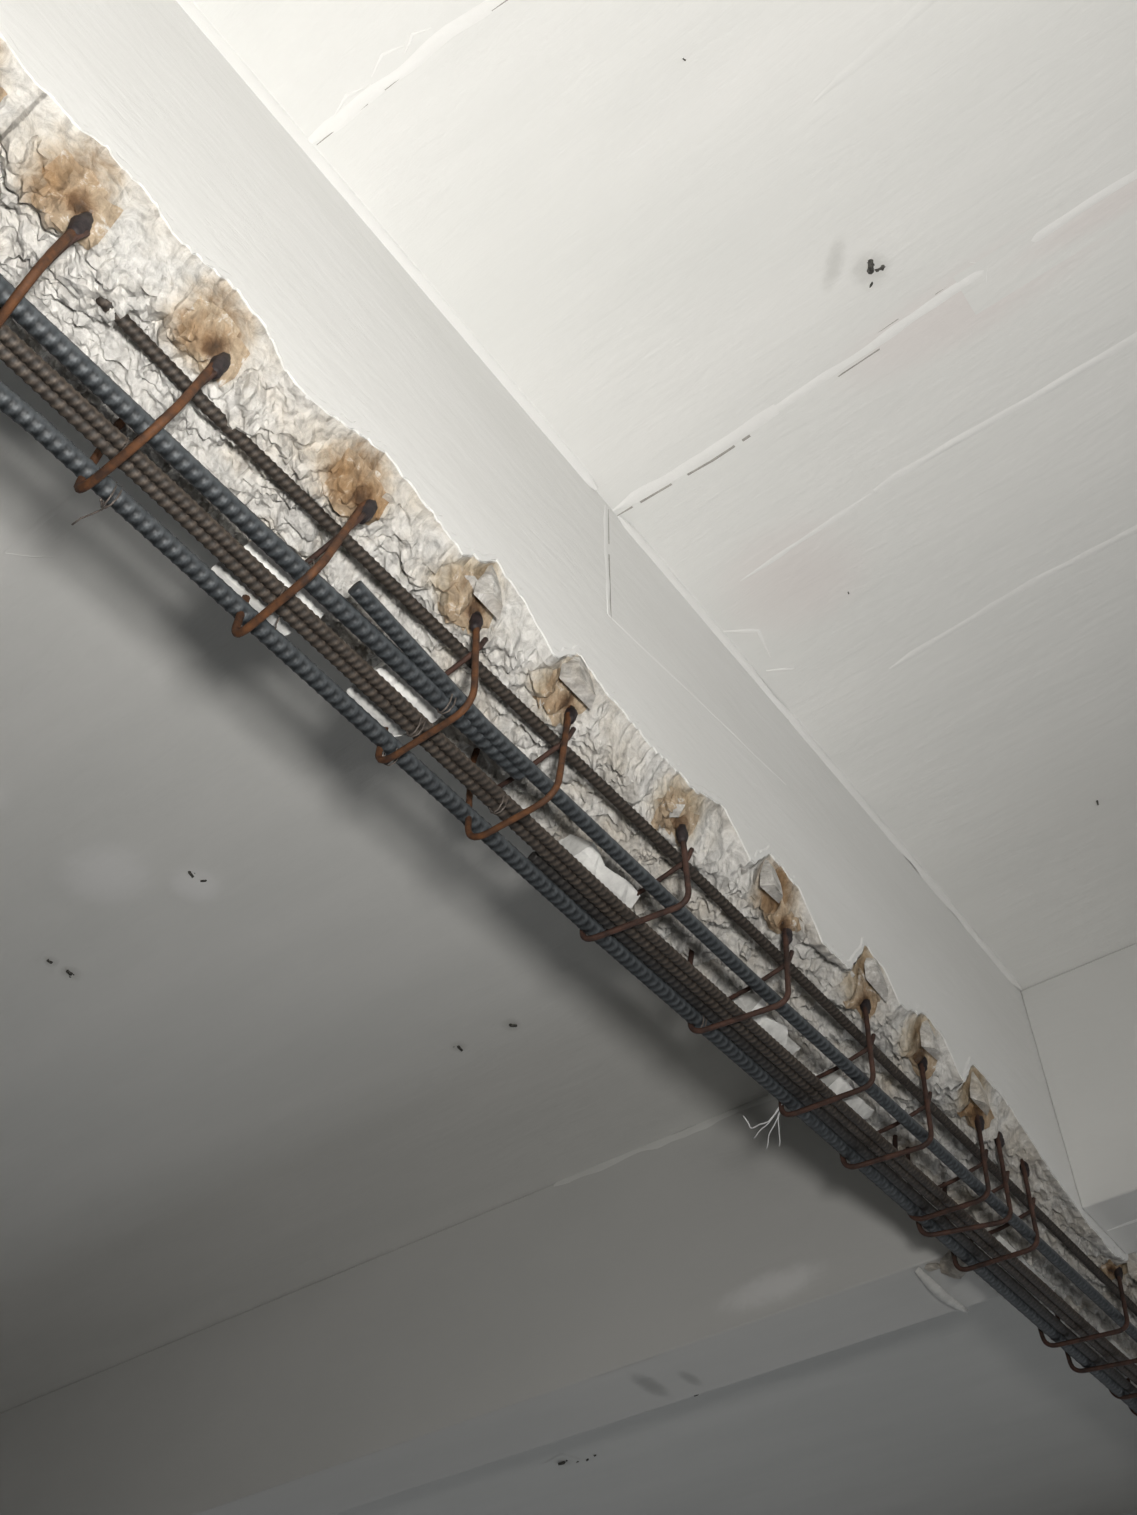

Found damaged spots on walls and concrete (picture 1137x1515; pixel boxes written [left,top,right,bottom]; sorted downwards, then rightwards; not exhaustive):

rust [0,37,159,299]
spalling [0,181,197,460]
rust [102,241,286,430]
crack [308,0,509,145]
crack [1031,169,1137,242]
crack [603,262,988,785]
spalling [0,267,1137,1413]
rust [710,855,1003,1144]
rust [1091,1259,1137,1305]